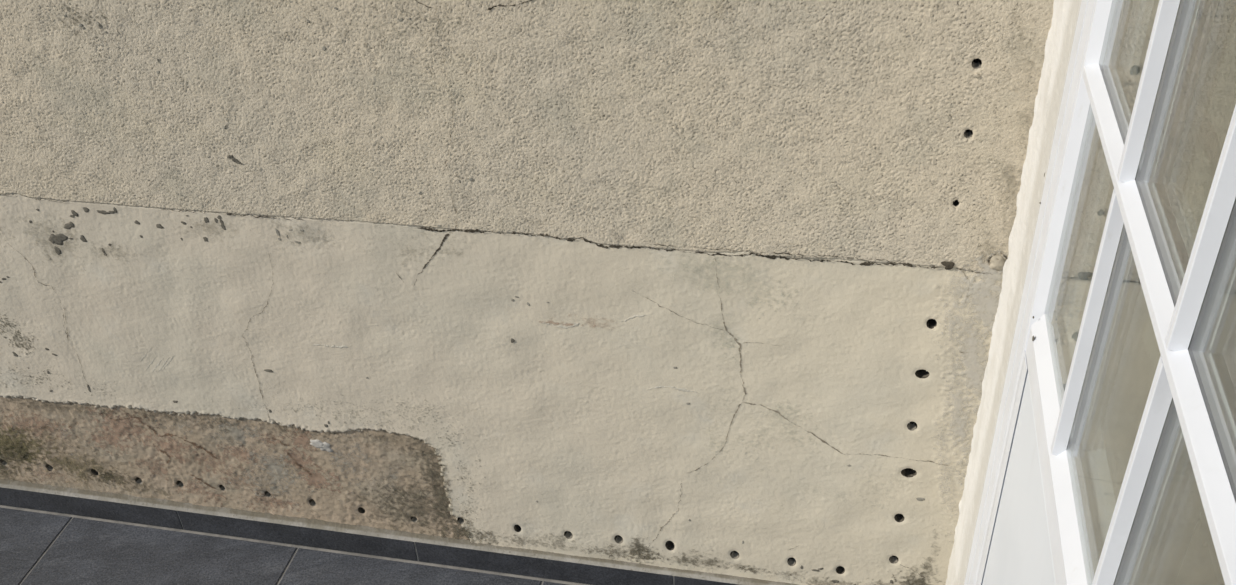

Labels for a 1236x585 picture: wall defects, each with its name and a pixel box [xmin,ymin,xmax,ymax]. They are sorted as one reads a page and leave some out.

crack [162,209,302,220]
crack [397,0,990,548]
flaking render [0,384,470,540]